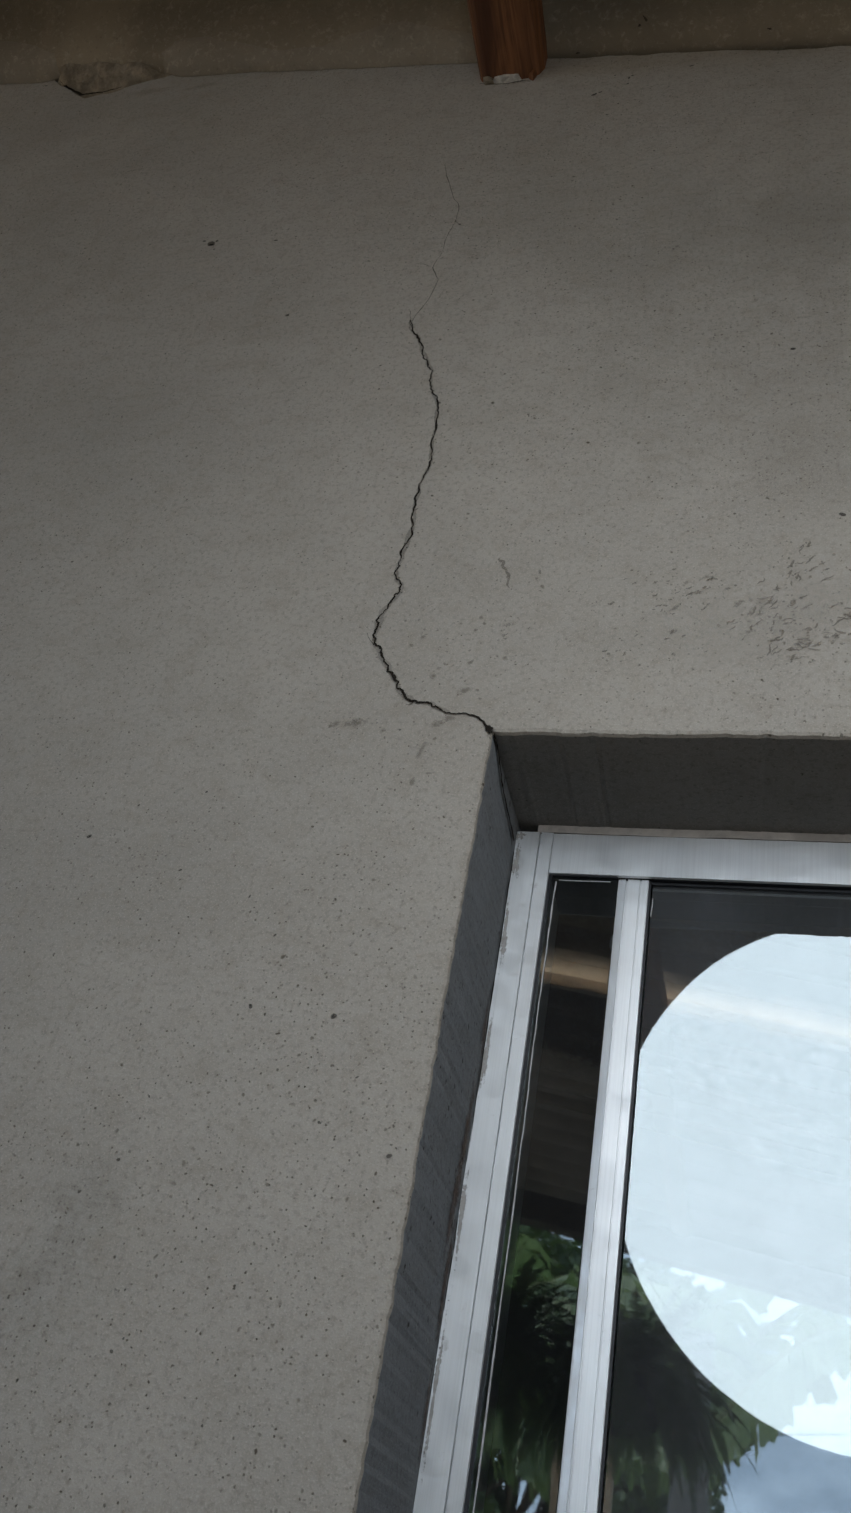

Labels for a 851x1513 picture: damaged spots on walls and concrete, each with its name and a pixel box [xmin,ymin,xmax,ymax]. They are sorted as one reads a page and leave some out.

spalling [45,61,171,98]
crack [367,168,514,1158]